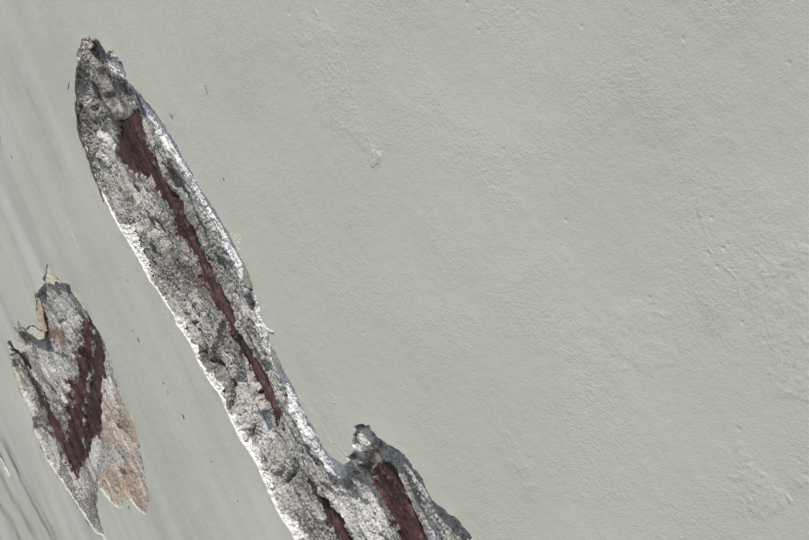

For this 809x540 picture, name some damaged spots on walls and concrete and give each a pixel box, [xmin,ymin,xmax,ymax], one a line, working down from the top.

spalling [7,264,150,540]
spalling [68,36,473,540]